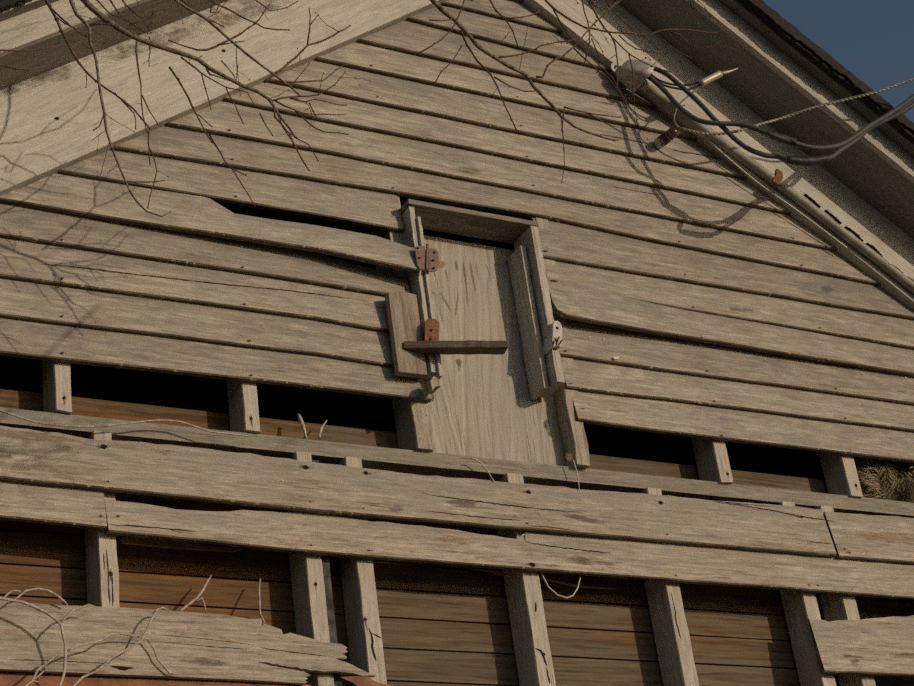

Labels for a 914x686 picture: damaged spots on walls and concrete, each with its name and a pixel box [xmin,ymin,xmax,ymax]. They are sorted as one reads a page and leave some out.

peeling [803,193,914,281]